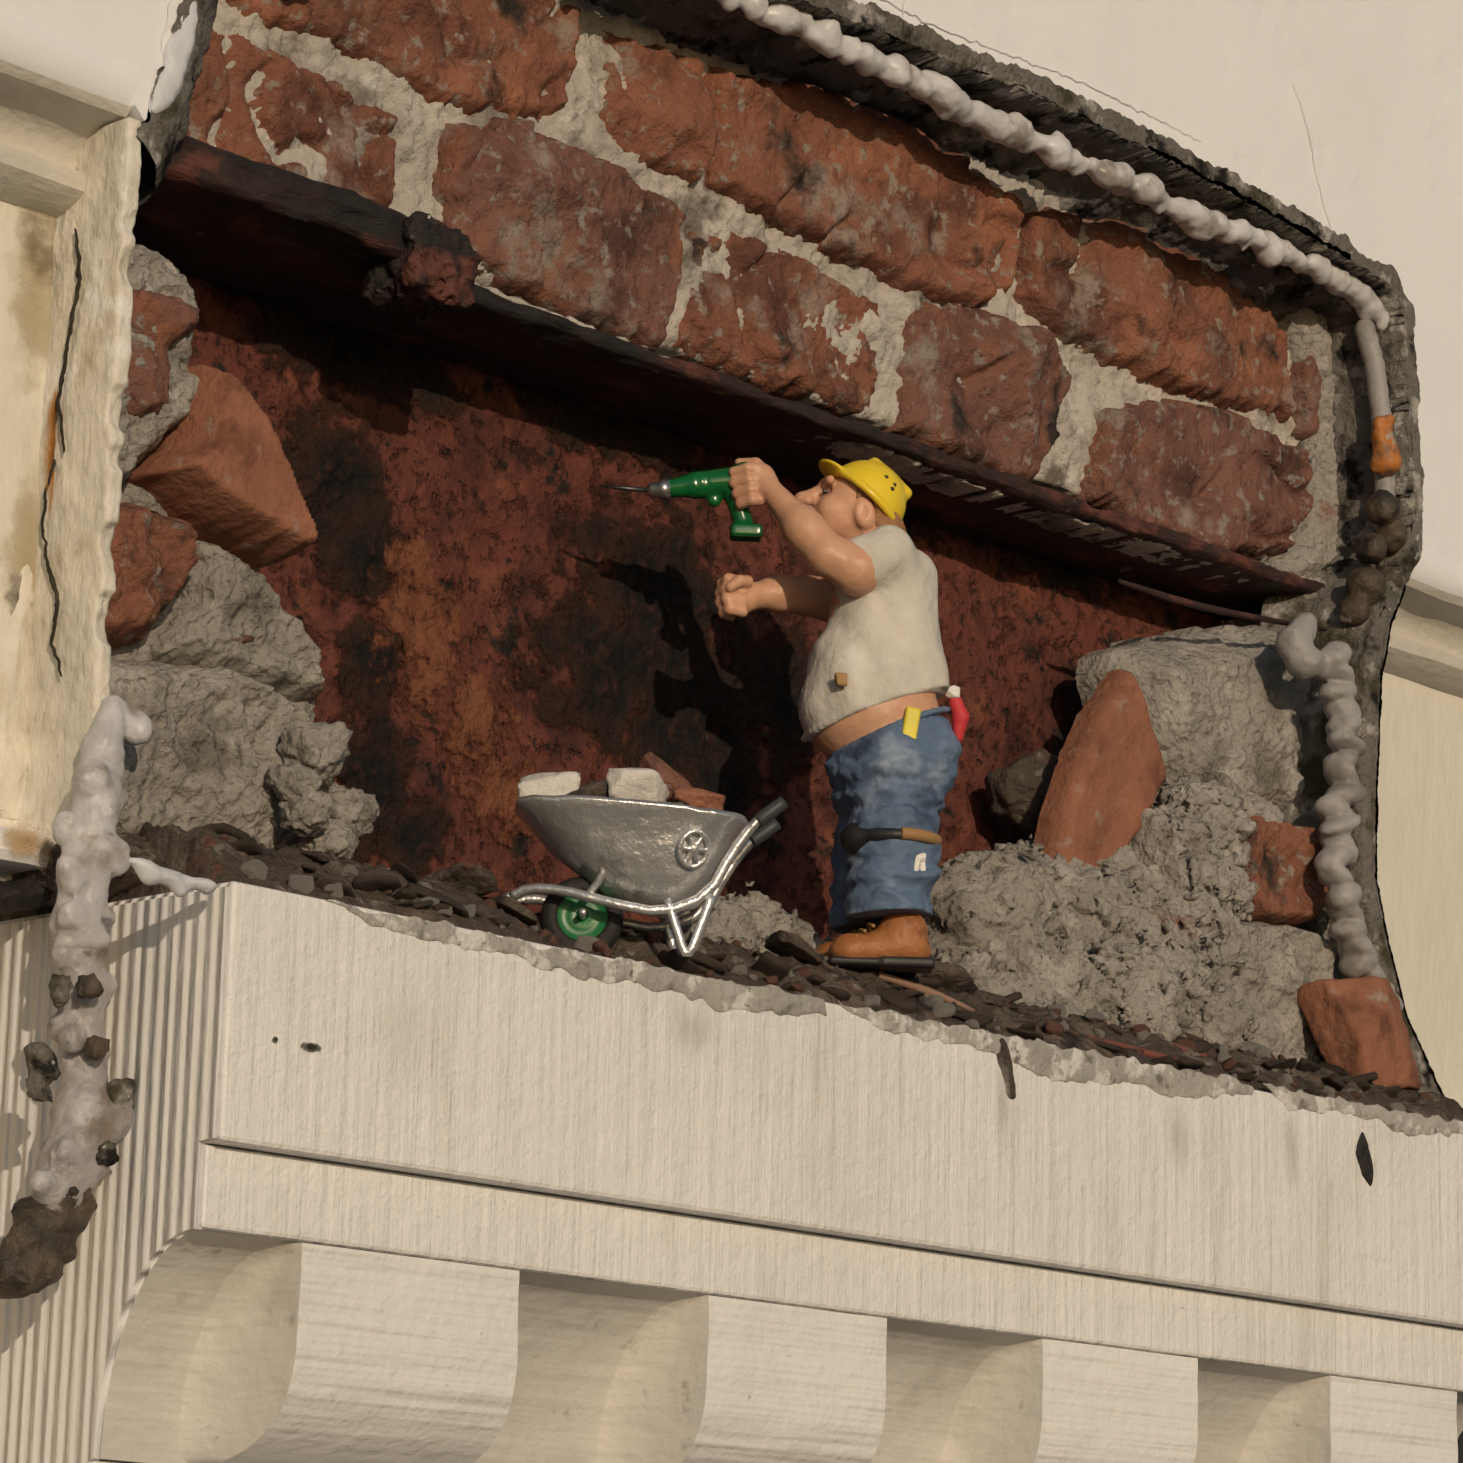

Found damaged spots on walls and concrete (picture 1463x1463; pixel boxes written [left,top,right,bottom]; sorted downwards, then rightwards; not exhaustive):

crack [41,228,82,677]
spalling [17,0,380,860]
damp [252,302,471,876]
damp [491,374,826,863]
damp [902,511,1125,607]
flaking render [591,0,1445,1096]
peeling [129,858,217,897]
peeling [327,900,1463,1138]